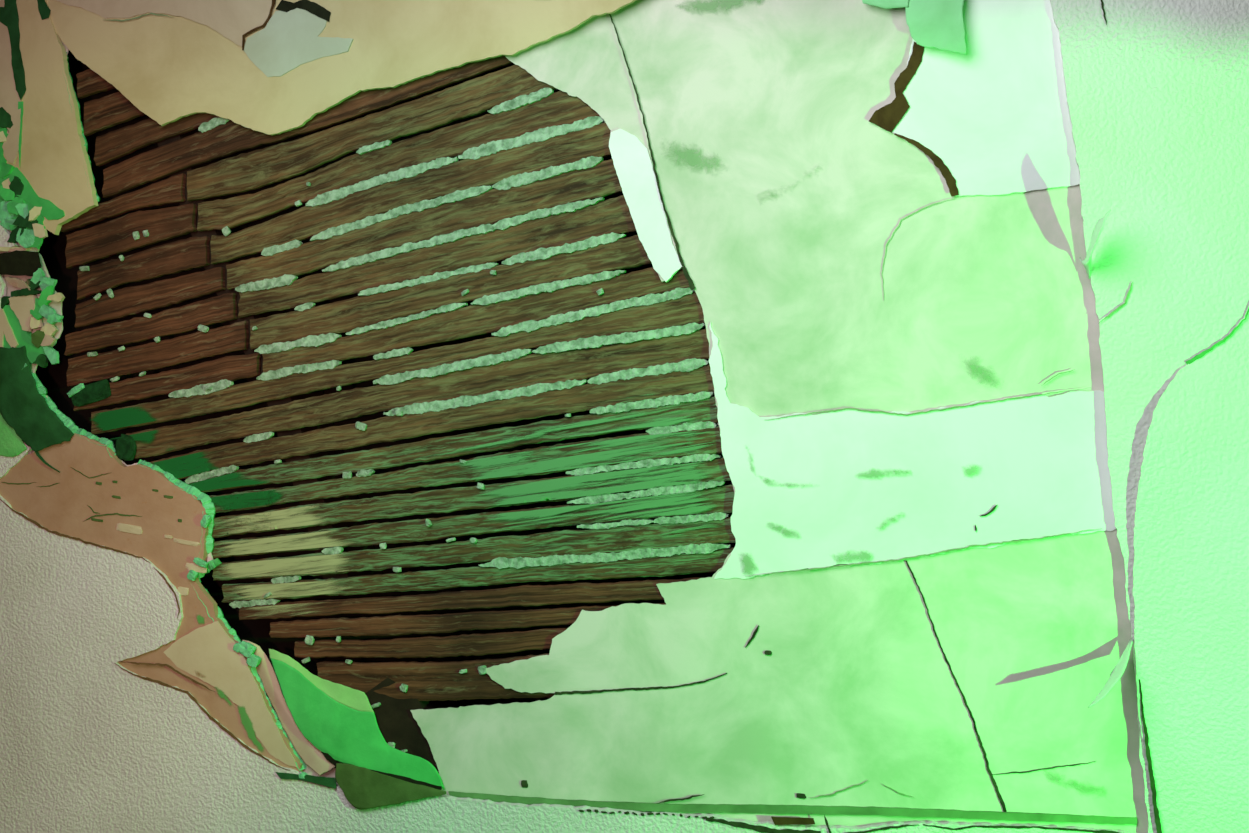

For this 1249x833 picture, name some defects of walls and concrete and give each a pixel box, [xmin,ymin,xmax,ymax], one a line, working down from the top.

spalling [0,22,65,252]
spalling [62,52,100,201]
crack [869,42,959,291]
crack [1098,282,1133,324]
crack [1186,308,1249,365]
peeling [0,268,445,788]
crack [657,505,1120,833]
peeling [578,809,714,819]
crack [1139,679,1162,833]